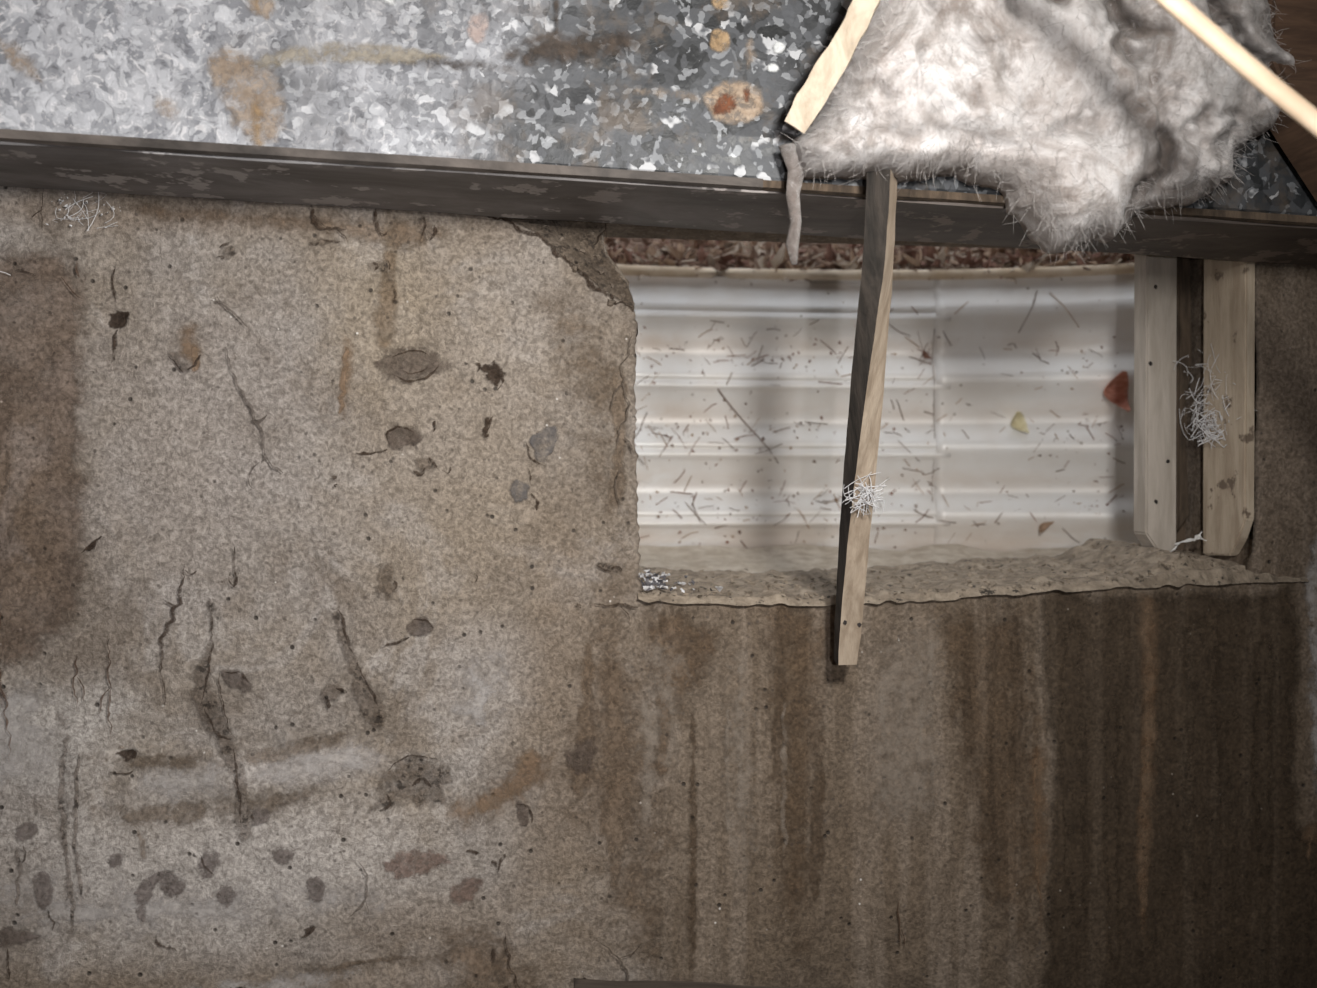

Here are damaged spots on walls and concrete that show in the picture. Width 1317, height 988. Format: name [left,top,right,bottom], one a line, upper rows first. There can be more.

corrosion [210,43,441,144]
corrosion [695,83,762,122]
spalling [487,216,635,312]
damp [0,252,254,928]
crack [159,565,196,705]
crack [228,547,238,587]
crack [0,672,11,755]
damp [571,614,715,970]
damp [766,605,826,915]
damp [947,539,1317,988]